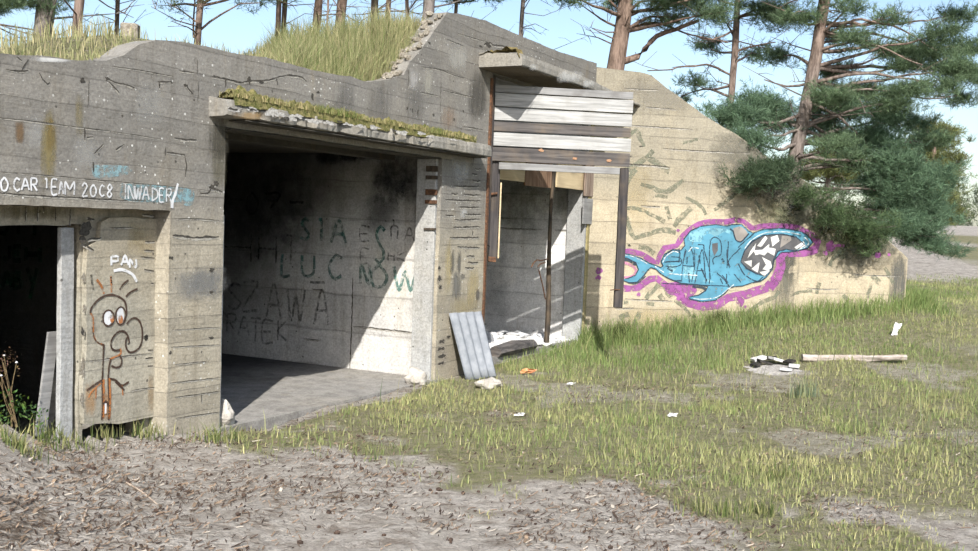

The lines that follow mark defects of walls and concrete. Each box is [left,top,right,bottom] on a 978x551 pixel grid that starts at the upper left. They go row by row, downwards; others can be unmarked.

crack [0,57,307,286]